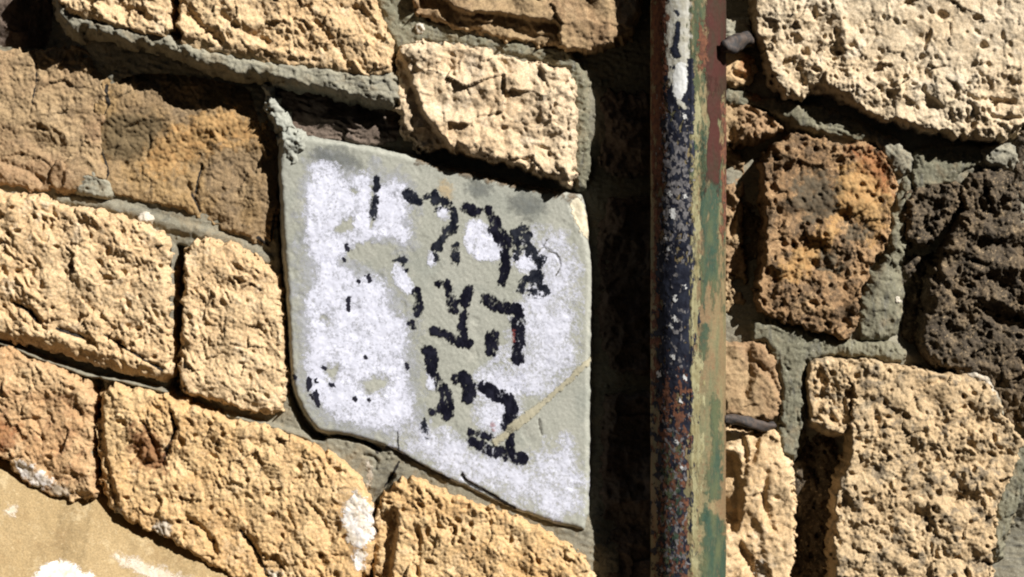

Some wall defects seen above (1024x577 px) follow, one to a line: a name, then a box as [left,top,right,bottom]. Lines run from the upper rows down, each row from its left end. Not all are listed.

damp [351,550,368,571]
corrosion [650,0,694,577]
peeling [650,0,727,577]
corrosion [717,96,727,245]